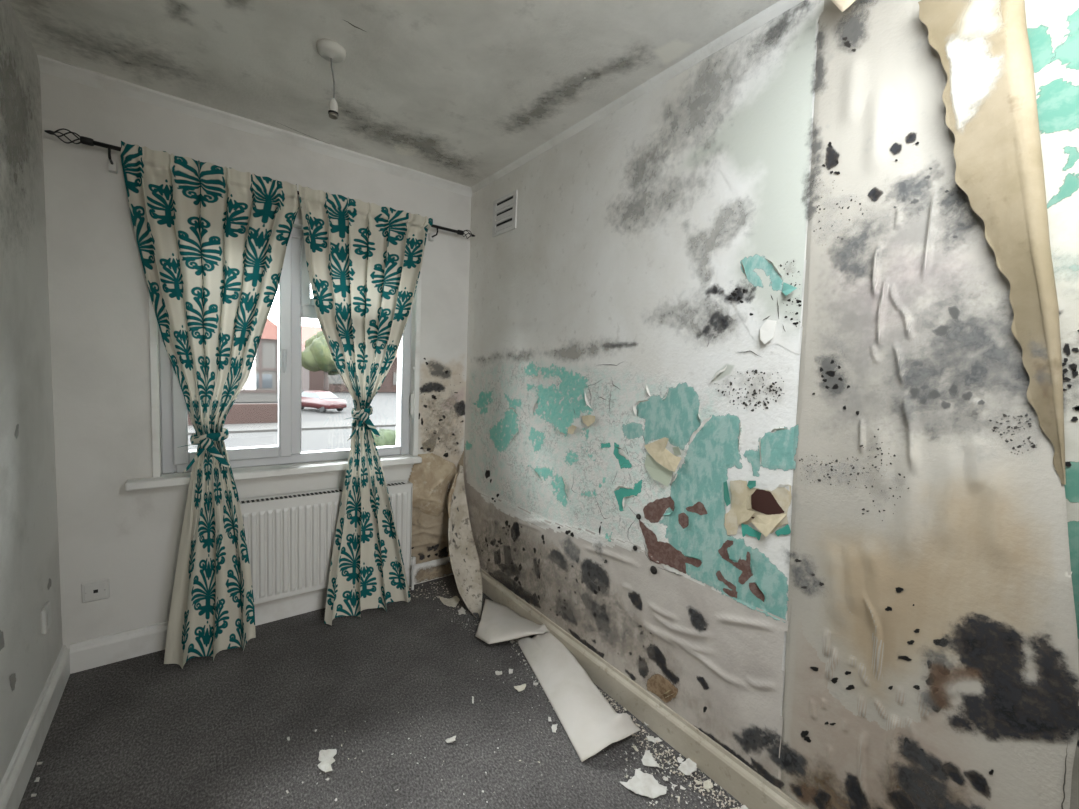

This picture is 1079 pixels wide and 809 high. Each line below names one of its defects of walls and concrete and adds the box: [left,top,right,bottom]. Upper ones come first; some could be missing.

water stain [346,110,462,169]
water stain [517,60,630,124]
water stain [617,0,1041,417]
flaking render [1024,0,1079,657]
water stain [411,349,467,474]
peeling [465,350,799,623]
water stain [411,525,467,583]
peeling [439,596,466,615]
water stain [480,520,679,703]
water stain [688,608,707,632]
water stain [698,407,1079,809]